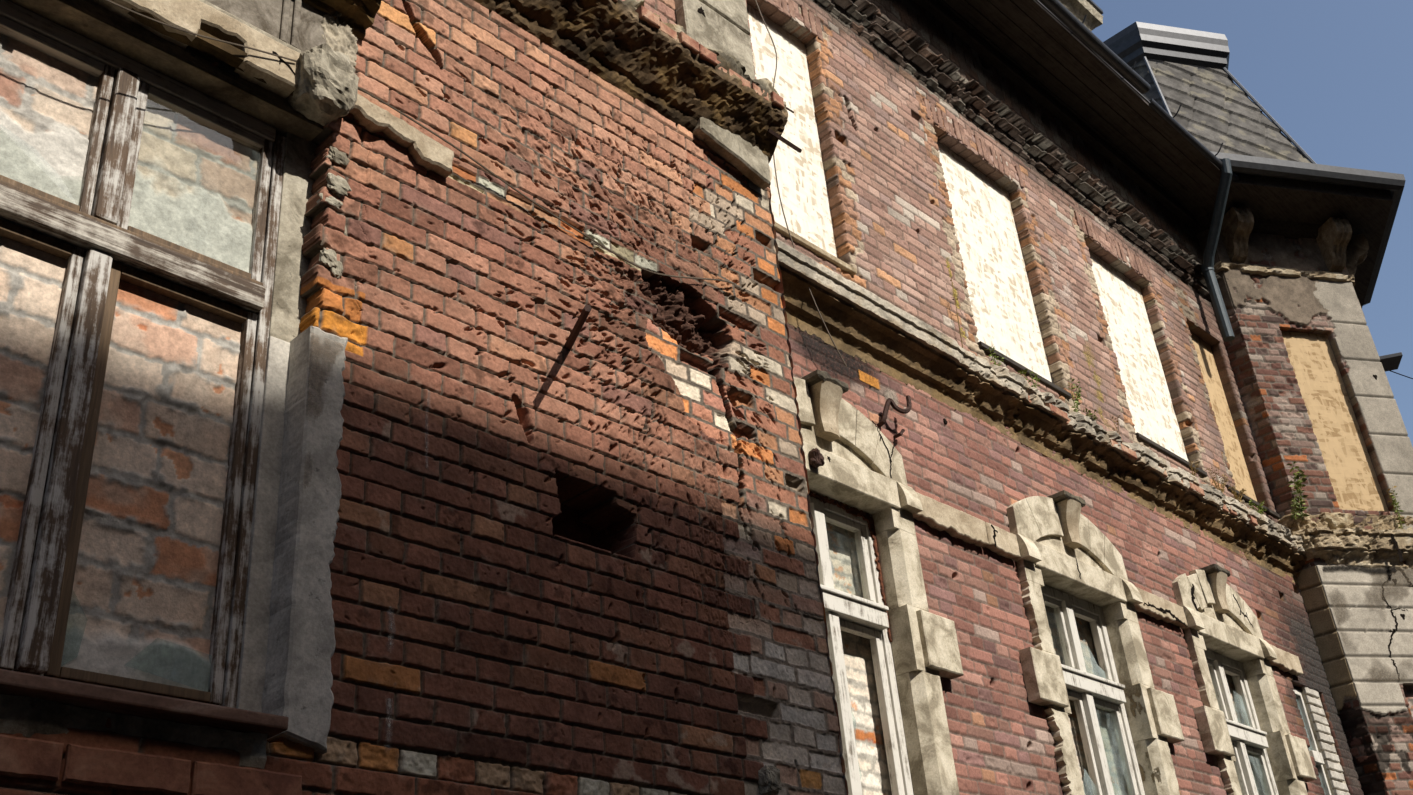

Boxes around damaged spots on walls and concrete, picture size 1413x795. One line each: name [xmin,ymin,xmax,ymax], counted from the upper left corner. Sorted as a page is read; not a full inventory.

peeling [321,11,358,68]
flaking render [635,5,785,110]
flaking render [1028,395,1074,427]
flaking render [1110,439,1137,460]
flaking render [1159,466,1205,497]
crack [1382,529,1413,681]